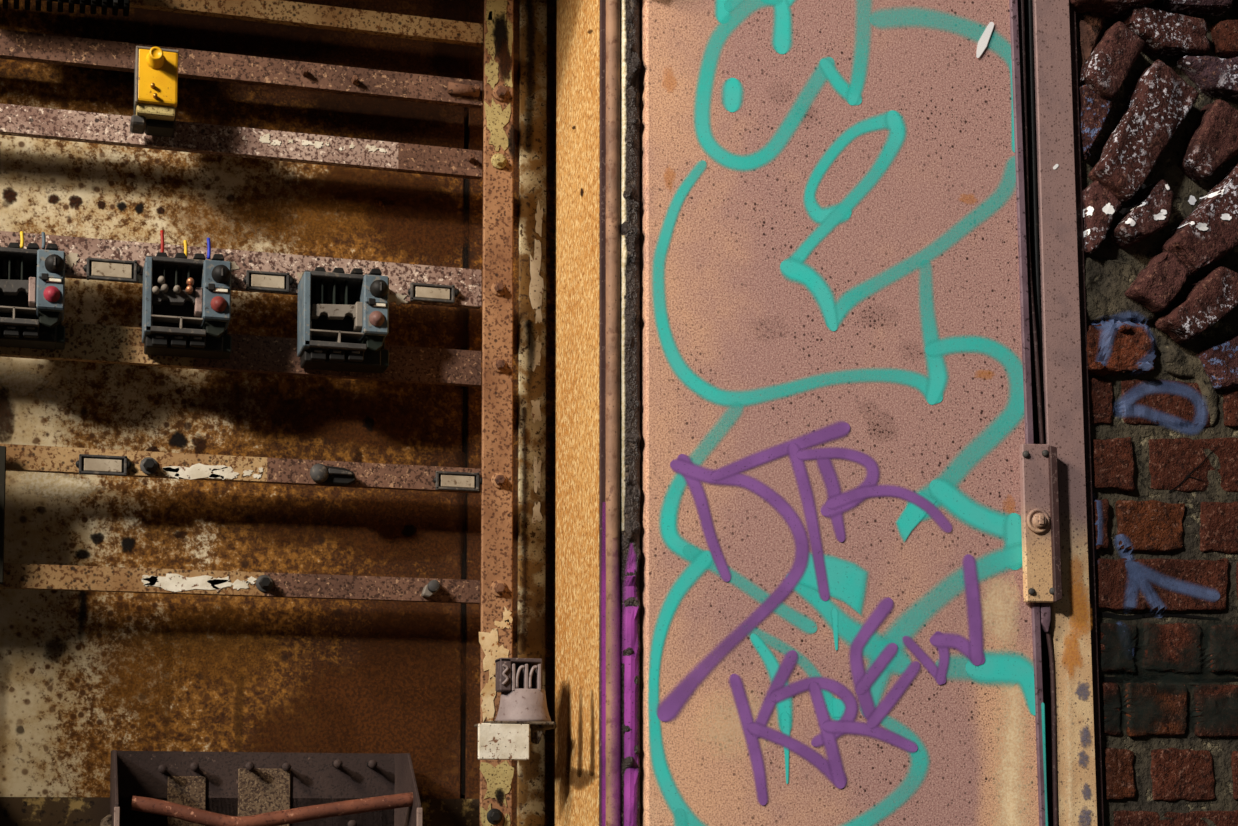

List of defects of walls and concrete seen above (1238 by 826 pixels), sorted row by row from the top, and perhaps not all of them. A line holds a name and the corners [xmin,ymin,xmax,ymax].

peeling [484,0,513,151]
corrosion [2,187,17,204]
corrosion [48,194,82,207]
corrosion [98,201,164,214]
corrosion [462,178,470,269]
corrosion [456,386,468,468]
peeling [163,463,263,480]
corrosion [78,591,87,630]
peeling [141,573,257,592]
corrosion [252,603,472,795]
peeling [479,606,513,722]
corrosion [1064,583,1089,672]